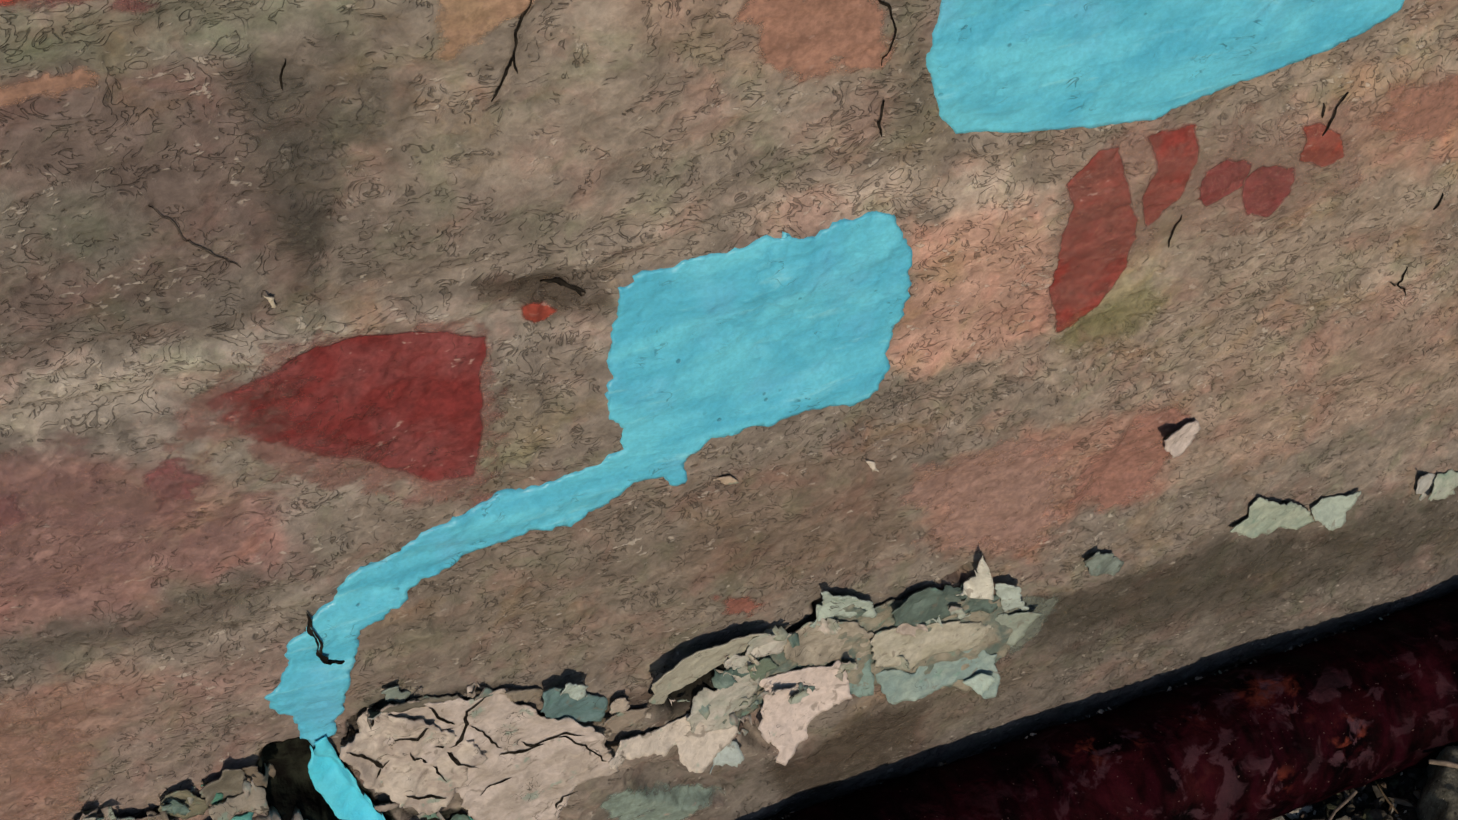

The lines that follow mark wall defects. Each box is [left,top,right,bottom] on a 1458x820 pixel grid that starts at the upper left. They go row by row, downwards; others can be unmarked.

crack [491,0,532,102]
crack [877,0,897,137]
peeling [1230,491,1361,538]
peeling [1415,469,1458,501]
peeling [78,555,1042,820]